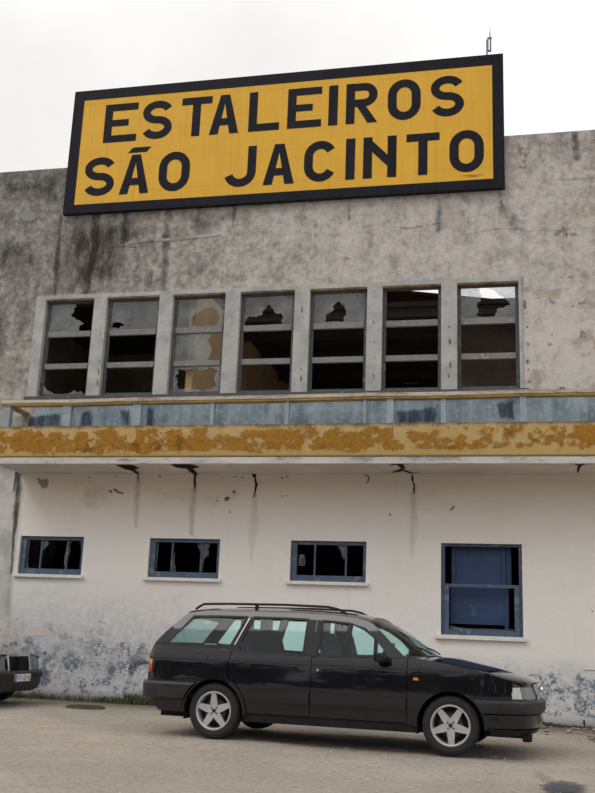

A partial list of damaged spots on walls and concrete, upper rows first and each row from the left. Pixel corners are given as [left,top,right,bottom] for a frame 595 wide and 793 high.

leakage [75,214,129,294]
crack [116,465,139,481]
crack [170,464,199,491]
crack [251,474,259,498]
peeling [0,423,595,455]
crack [389,429,420,494]
leakage [10,472,21,573]
peeling [2,631,149,696]
peeling [528,673,595,718]